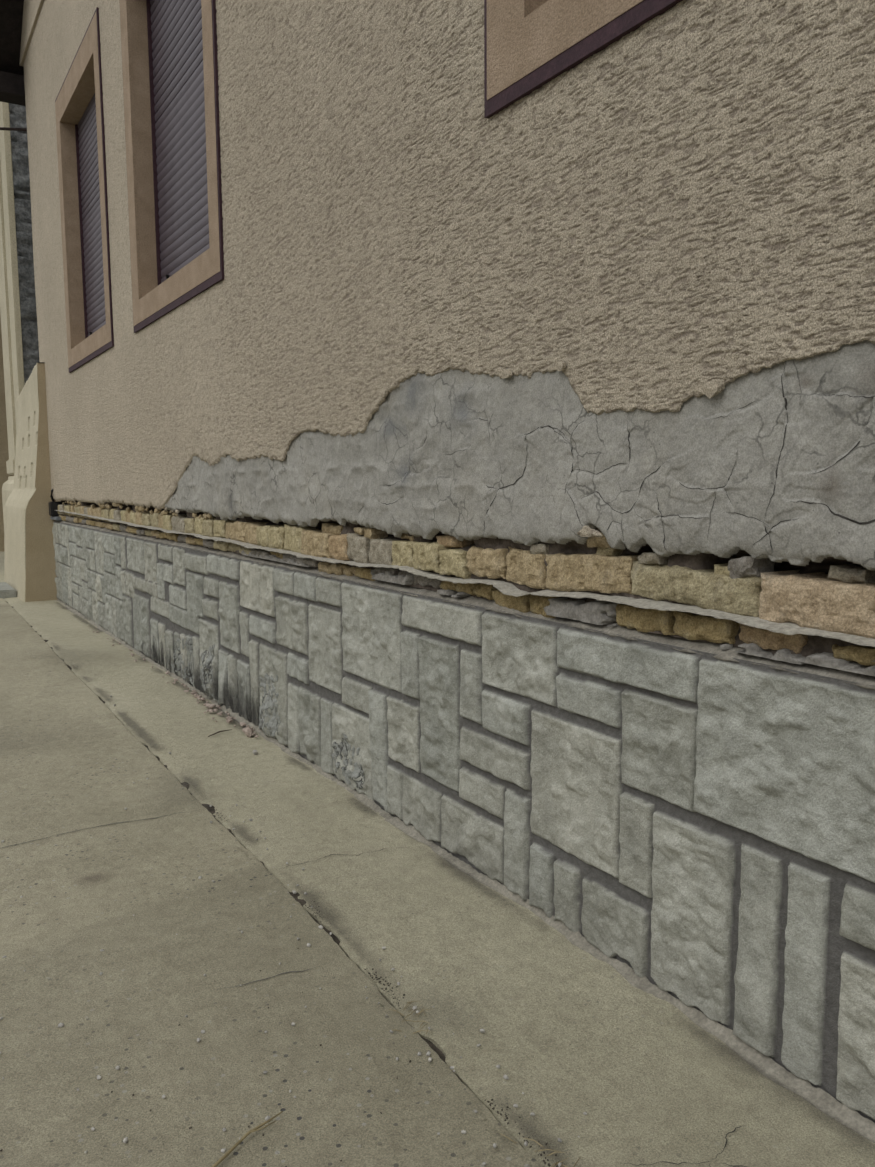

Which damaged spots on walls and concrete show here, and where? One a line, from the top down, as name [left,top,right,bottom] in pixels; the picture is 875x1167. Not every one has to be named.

crack [359,413,493,512]
flaking render [54,340,875,676]
crack [483,361,875,554]
crack [617,1125,747,1167]